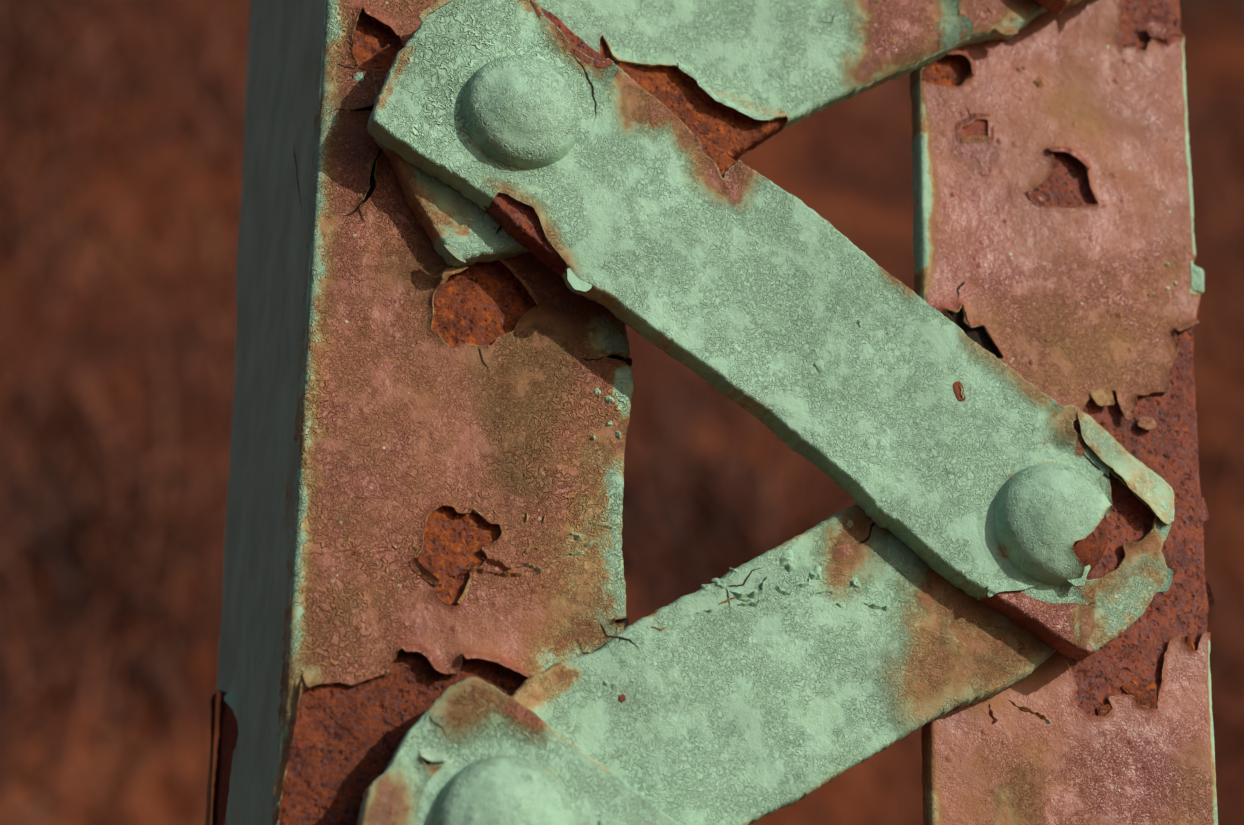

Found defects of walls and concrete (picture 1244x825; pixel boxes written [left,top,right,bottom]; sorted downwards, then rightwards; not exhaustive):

corrosion [353,7,404,73]
crack [573,55,597,121]
corrosion [842,0,1039,97]
corrosion [1027,146,1096,209]
corrosion [484,180,580,277]
corrosion [409,506,501,606]
peeling [696,574,855,614]
peeling [987,577,1042,597]
corrosion [883,319,1214,731]
peeling [1067,411,1175,587]
peeling [274,675,302,796]
peeling [419,747,448,764]